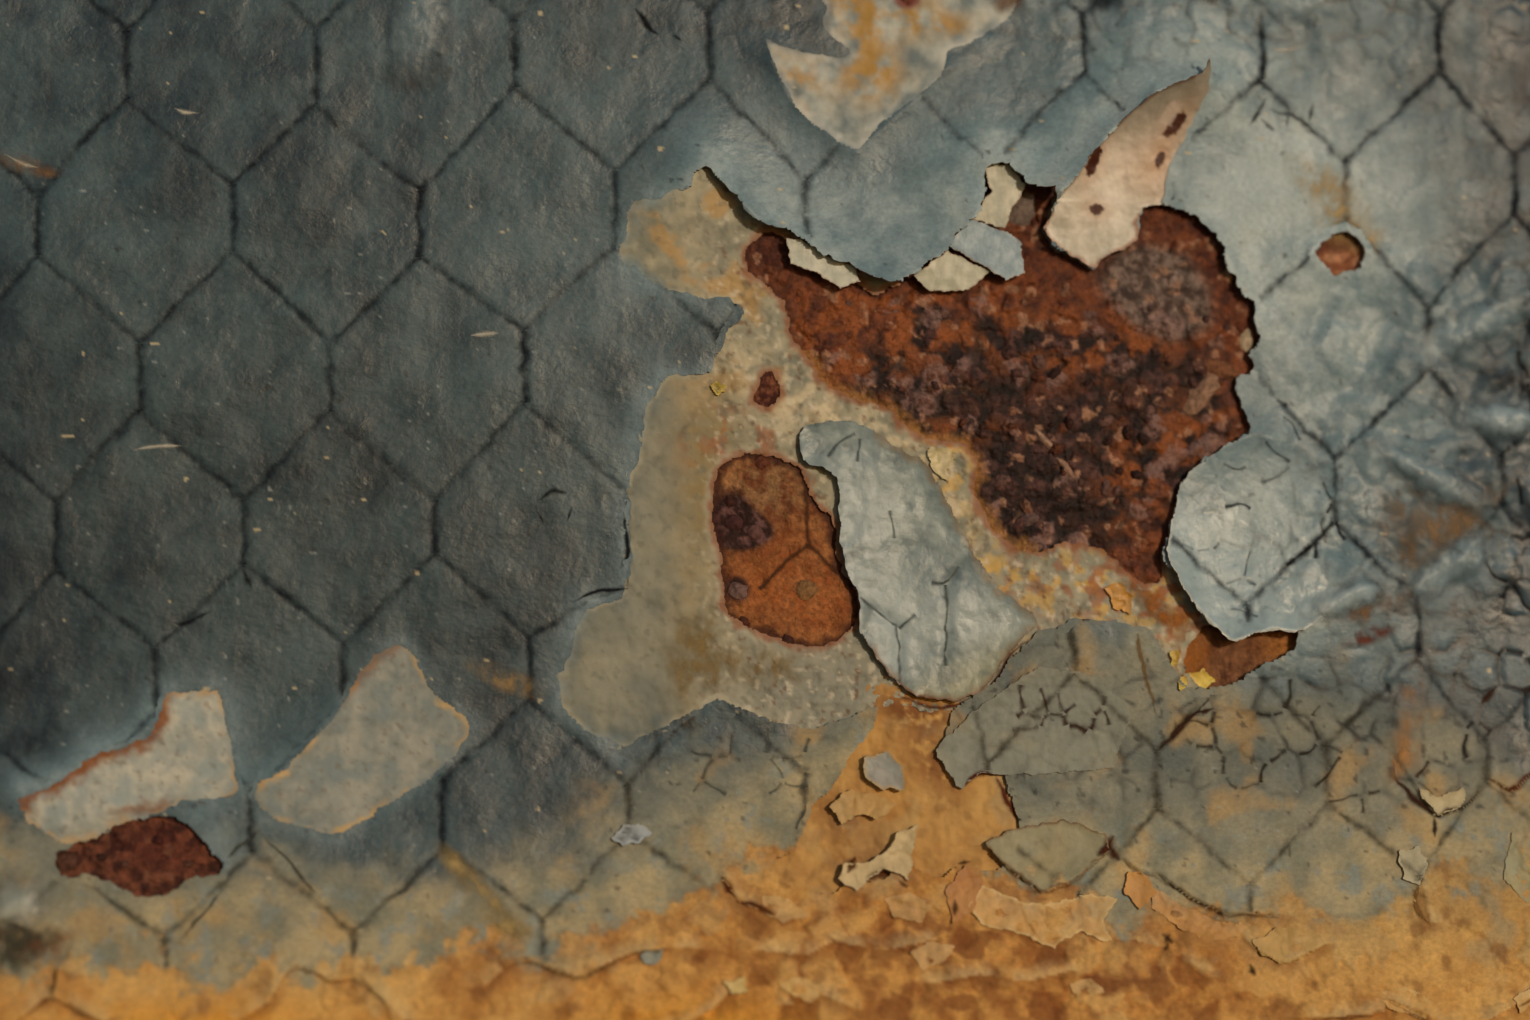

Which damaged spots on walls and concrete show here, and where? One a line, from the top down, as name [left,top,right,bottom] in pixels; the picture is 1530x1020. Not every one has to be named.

peeling [766,0,1016,149]
peeling [1042,58,1211,271]
corrosion [1315,207,1373,276]
corrosion [745,163,1297,689]
peeling [556,164,1337,965]
crack [1286,492,1346,566]
corrosion [55,816,223,897]
peeling [17,645,469,844]
crack [857,567,1110,733]
crack [1137,637,1224,772]
crack [1257,649,1530,834]
peeling [1419,788,1466,815]